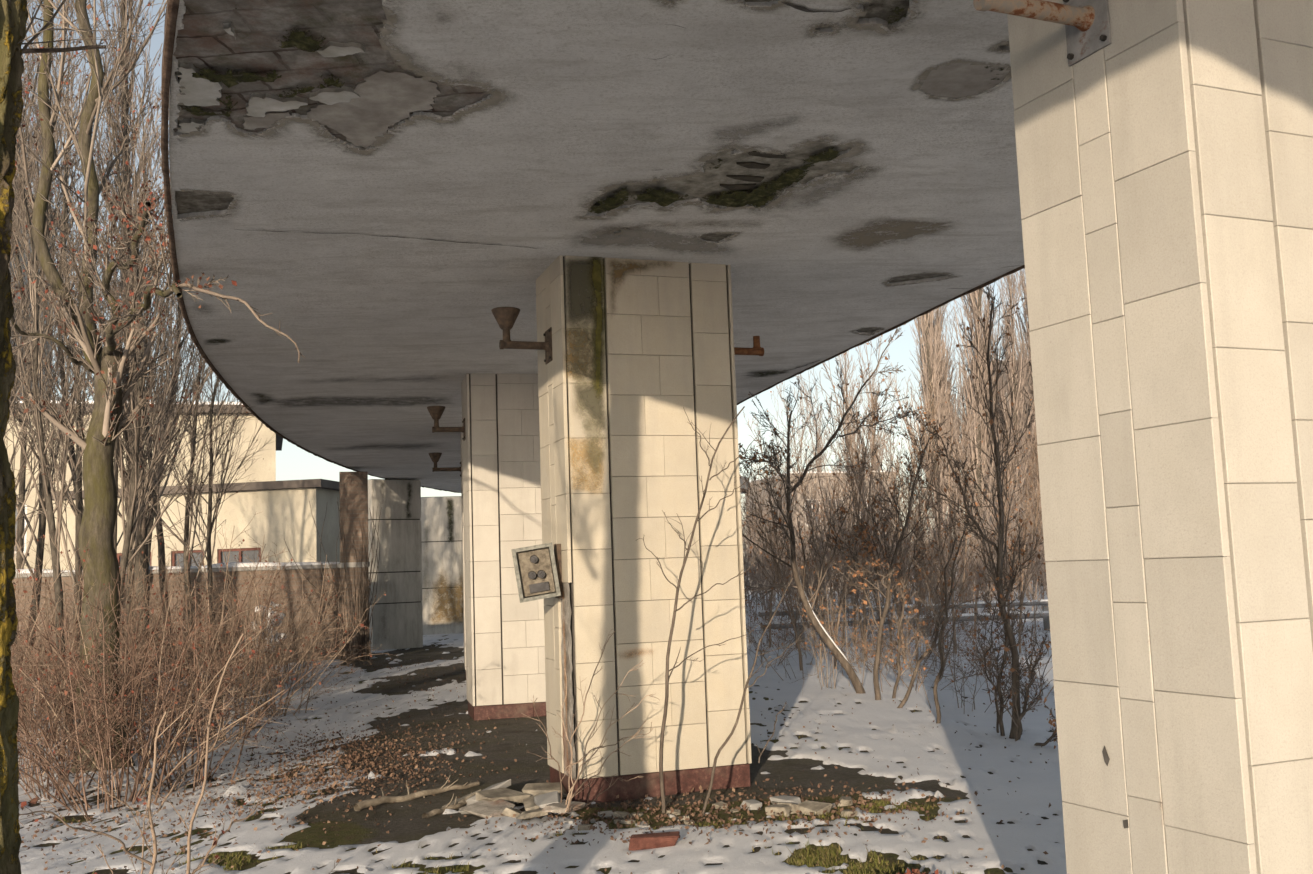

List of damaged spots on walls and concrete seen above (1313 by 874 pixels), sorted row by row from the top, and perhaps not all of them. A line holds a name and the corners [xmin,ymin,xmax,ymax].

crack [781,2,851,13]
spalling [173,0,508,156]
peeling [912,41,1012,101]
spalling [579,135,873,235]
water stain [838,220,947,250]